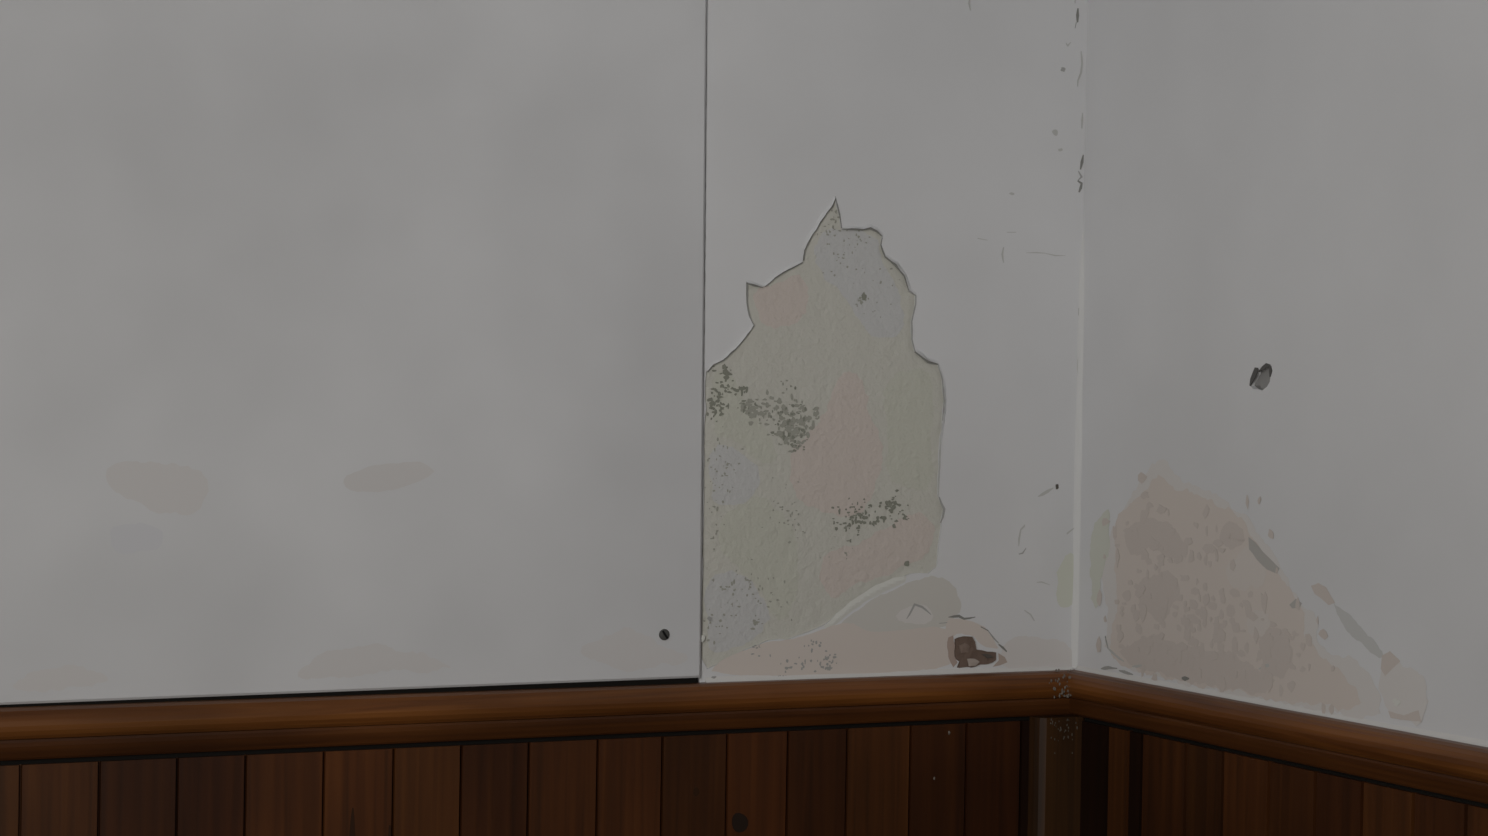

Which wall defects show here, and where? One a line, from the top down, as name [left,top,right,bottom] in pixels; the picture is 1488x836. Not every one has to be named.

peeling [701,202,947,679]
damp [704,364,1072,676]
hole [954,636,996,668]
damp [1056,459,1429,726]